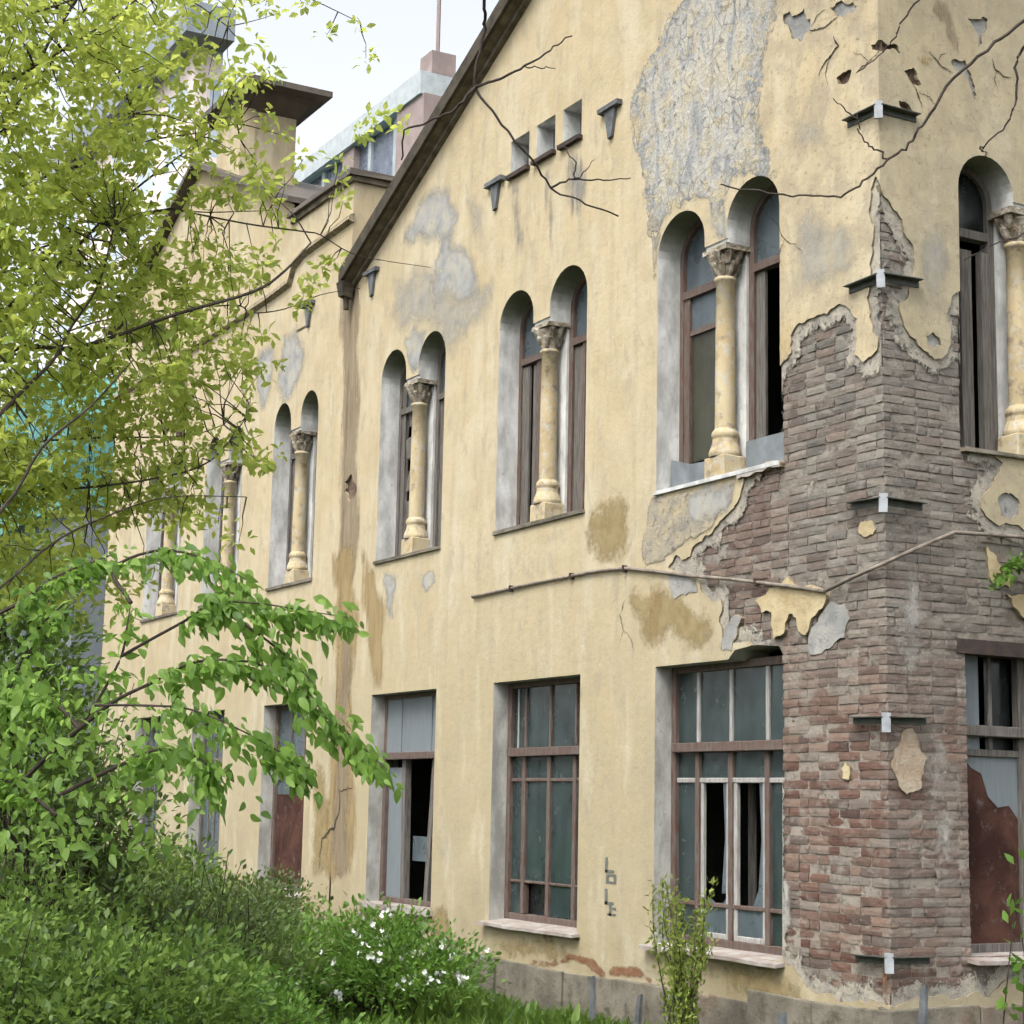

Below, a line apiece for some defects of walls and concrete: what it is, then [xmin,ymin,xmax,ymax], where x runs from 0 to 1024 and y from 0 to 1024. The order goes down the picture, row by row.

peeling [630,0,812,277]
flaking render [833,1,857,17]
flaking render [951,60,975,98]
flaking render [969,18,986,44]
damp [332,284,383,734]
damp [588,500,627,560]
damp [630,591,712,648]
flaking render [641,178,1024,1008]
damp [313,745,354,879]
crack [319,694,352,864]